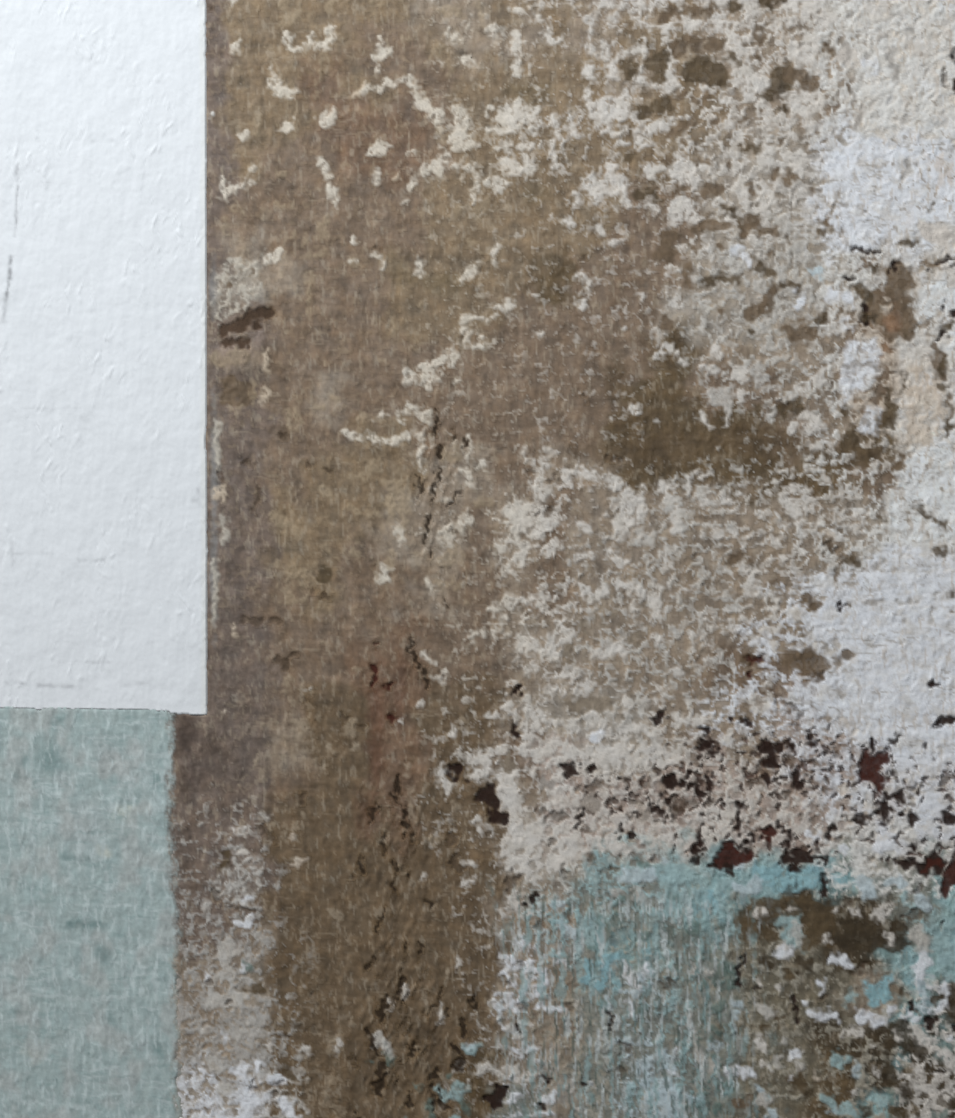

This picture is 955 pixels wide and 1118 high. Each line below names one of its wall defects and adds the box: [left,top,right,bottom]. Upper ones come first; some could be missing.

corrosion [742,653,770,680]
corrosion [816,669,826,683]
corrosion [596,688,955,922]